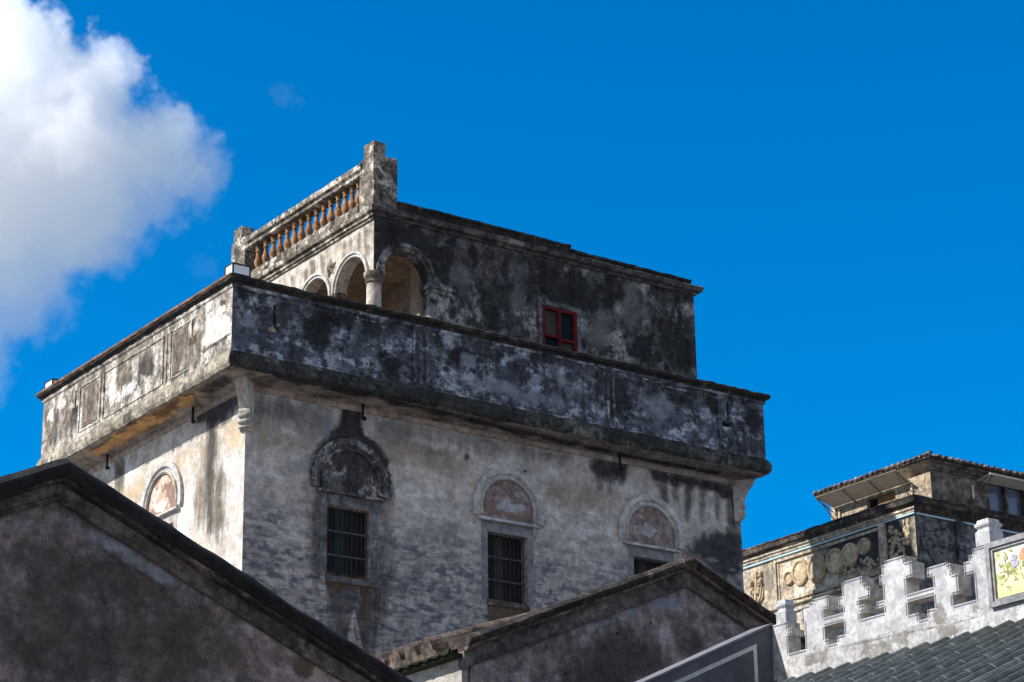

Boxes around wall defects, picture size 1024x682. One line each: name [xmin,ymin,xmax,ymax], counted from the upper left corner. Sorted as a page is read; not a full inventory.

water stain [535,261,624,311]
water stain [116,339,153,390]
water stain [182,304,204,355]
water stain [378,352,403,378]
water stain [406,324,503,367]
water stain [626,295,692,373]
water stain [656,380,761,429]
water stain [196,395,240,530]
water stain [256,401,415,503]
water stain [590,459,629,481]
peeling [152,481,176,514]
peeling [483,485,529,520]